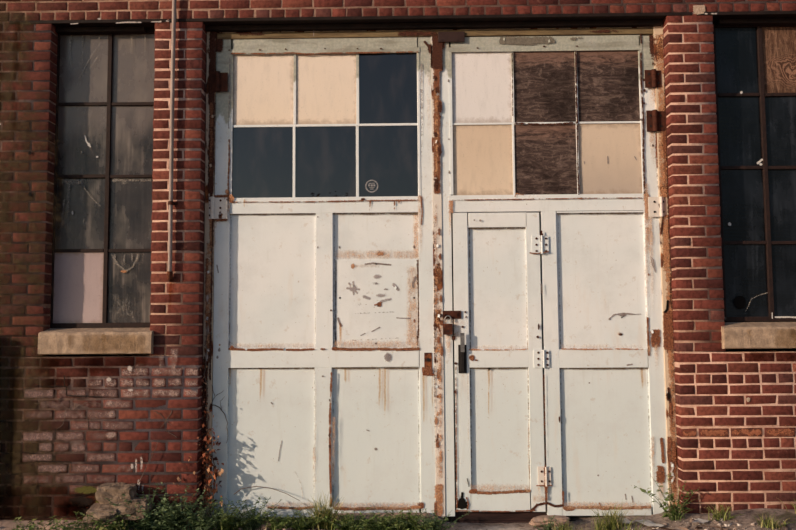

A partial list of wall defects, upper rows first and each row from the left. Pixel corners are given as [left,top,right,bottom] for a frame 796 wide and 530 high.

rust [207,31,450,209]
damp [24,350,197,517]
rust [200,219,228,508]
rust [228,197,423,351]
peeling [346,275,399,314]
rust [328,372,424,511]
rust [422,366,440,379]
rust [434,484,443,517]
rust [454,348,651,512]
rust [562,34,678,505]